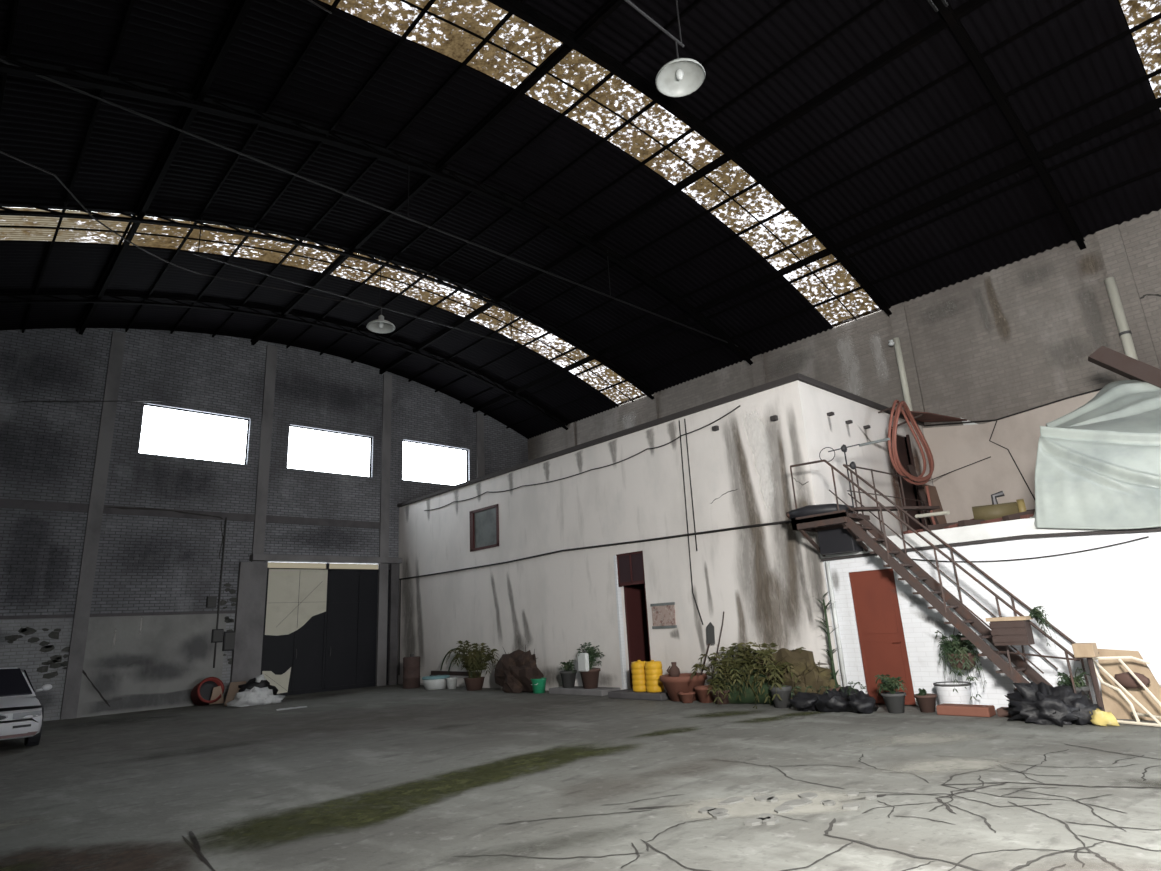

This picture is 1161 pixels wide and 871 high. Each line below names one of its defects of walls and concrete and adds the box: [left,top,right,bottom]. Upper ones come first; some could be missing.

damp [737,431,797,649]
spalling [5,627,70,679]
crack [453,794,712,871]
crack [714,744,1161,871]